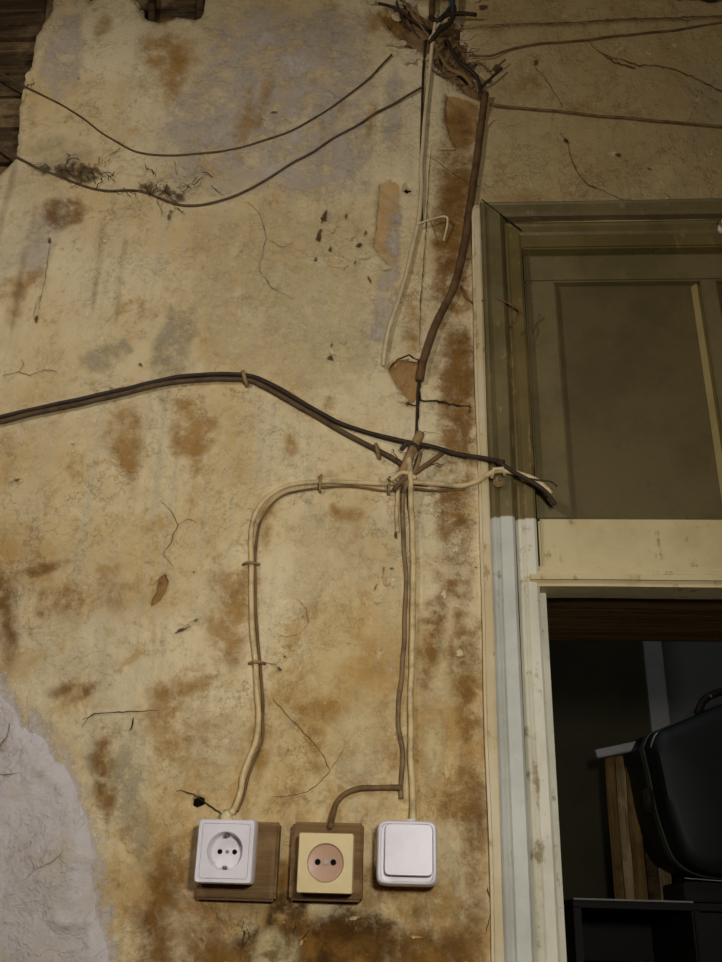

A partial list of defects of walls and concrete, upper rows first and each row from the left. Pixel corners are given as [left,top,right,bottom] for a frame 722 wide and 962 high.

flaking render [382,0,500,150]
crack [460,0,722,92]
leakage [46,199,82,227]
flaking render [316,181,411,270]
leakage [433,114,472,314]
crack [561,134,631,200]
leakage [440,323,476,540]
flaking render [150,573,169,606]
leakage [419,599,444,689]
leakage [451,611,476,741]
leakage [142,850,178,962]
leakage [185,867,474,962]